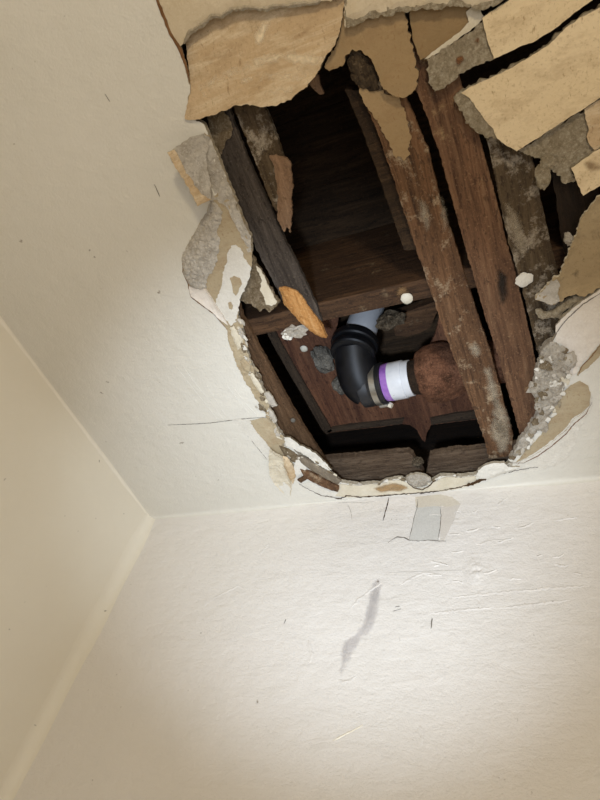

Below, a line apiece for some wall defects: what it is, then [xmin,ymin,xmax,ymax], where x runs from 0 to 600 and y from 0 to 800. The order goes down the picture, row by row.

flaking render [159,0,332,46]
flaking render [344,0,503,28]
peeling [167,133,600,541]